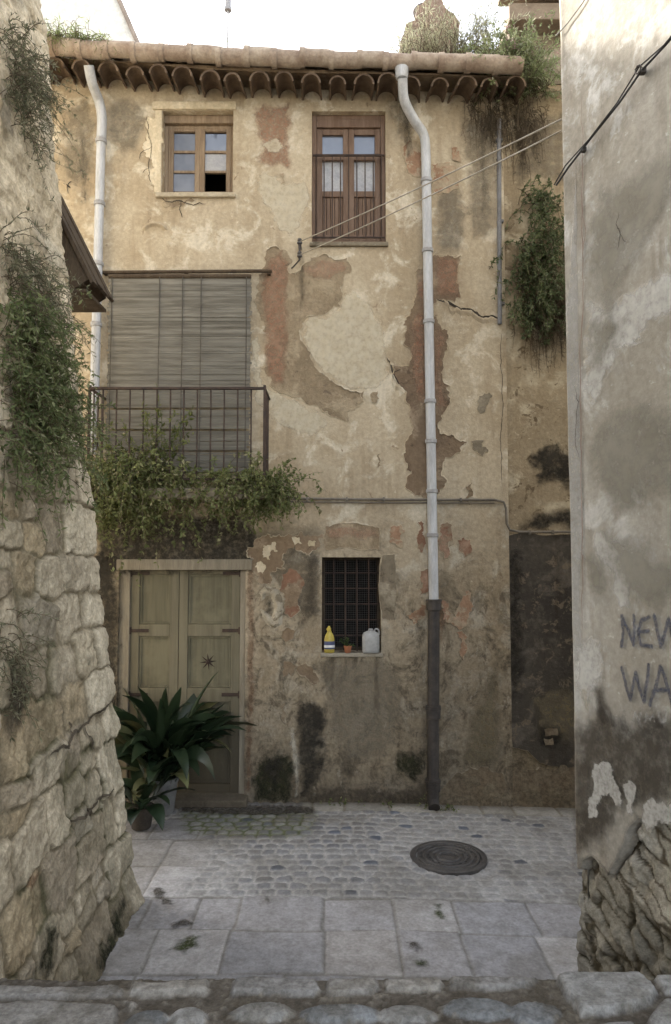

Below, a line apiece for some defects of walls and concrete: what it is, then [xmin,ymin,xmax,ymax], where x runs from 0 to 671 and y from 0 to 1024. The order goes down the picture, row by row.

crack [139,117,202,218]
flaking render [256,106,290,184]
flaking render [254,245,379,422]
flaking render [392,254,489,498]
crack [437,299,503,479]
flaking render [246,520,474,643]
damp [292,702,421,804]
damp [576,638,671,842]
flaking render [439,762,671,981]